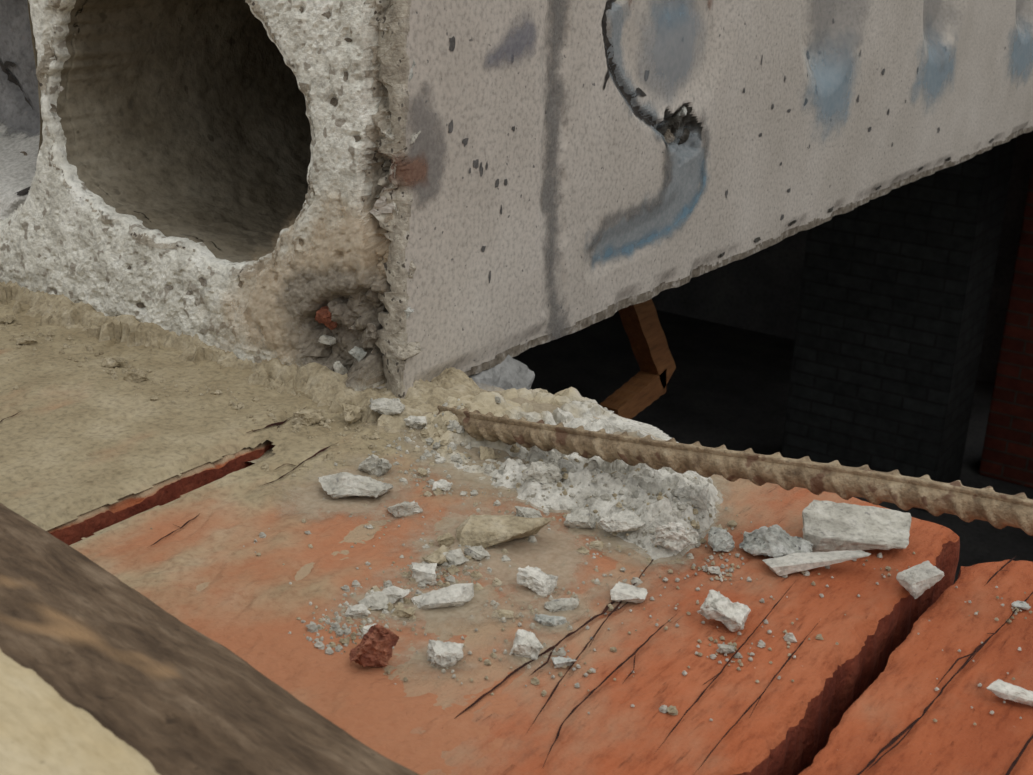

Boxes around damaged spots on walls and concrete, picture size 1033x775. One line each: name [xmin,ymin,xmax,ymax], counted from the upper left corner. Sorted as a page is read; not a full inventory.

spalling [245,0,279,46]
crack [0,61,33,109]
spalling [36,31,64,113]
spalling [292,68,311,119]
spalling [44,125,119,225]
spalling [333,0,422,399]
spalling [128,227,195,265]
spalling [231,167,314,288]
spalling [315,306,338,345]